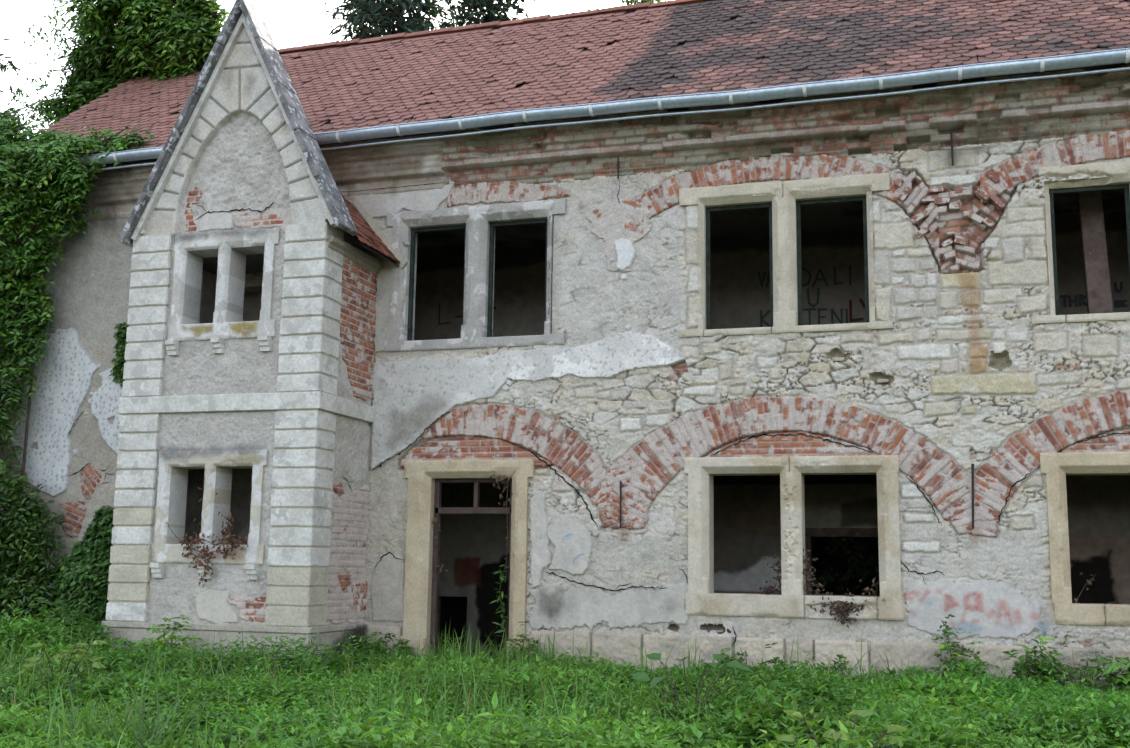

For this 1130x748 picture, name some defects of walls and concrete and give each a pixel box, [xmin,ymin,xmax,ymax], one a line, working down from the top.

flaking render [185,187,283,232]
crack [196,202,274,220]
spalling [895,170,1016,274]
peeling [339,177,689,470]
spalling [823,346,854,367]
peeling [11,327,124,538]
flaking render [325,482,370,625]
crack [546,568,688,591]
peeling [195,590,267,625]